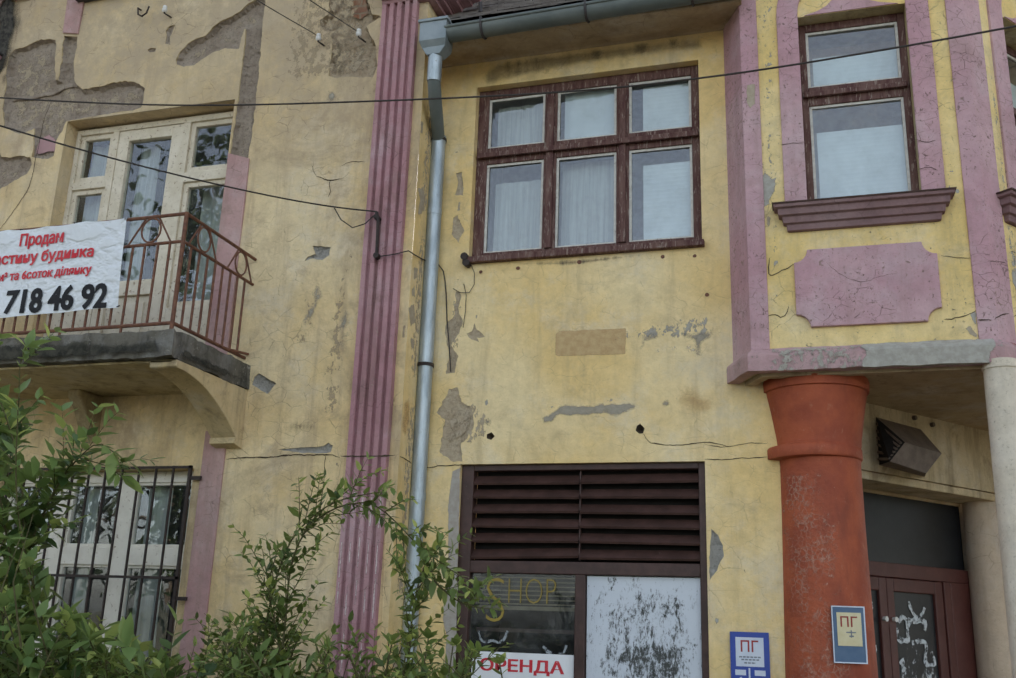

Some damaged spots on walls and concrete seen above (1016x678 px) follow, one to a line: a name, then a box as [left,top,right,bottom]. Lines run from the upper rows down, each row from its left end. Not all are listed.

flaking render [148,25,175,52]
flaking render [286,0,381,78]
flaking render [0,36,145,189]
flaking render [176,0,265,158]
peeling [452,172,464,243]
peeling [445,279,485,374]
peeling [555,318,709,356]
peeling [772,312,996,371]
flaking render [252,373,276,394]
crack [706,442,766,460]
peeling [437,387,494,678]
flaking render [709,529,724,579]